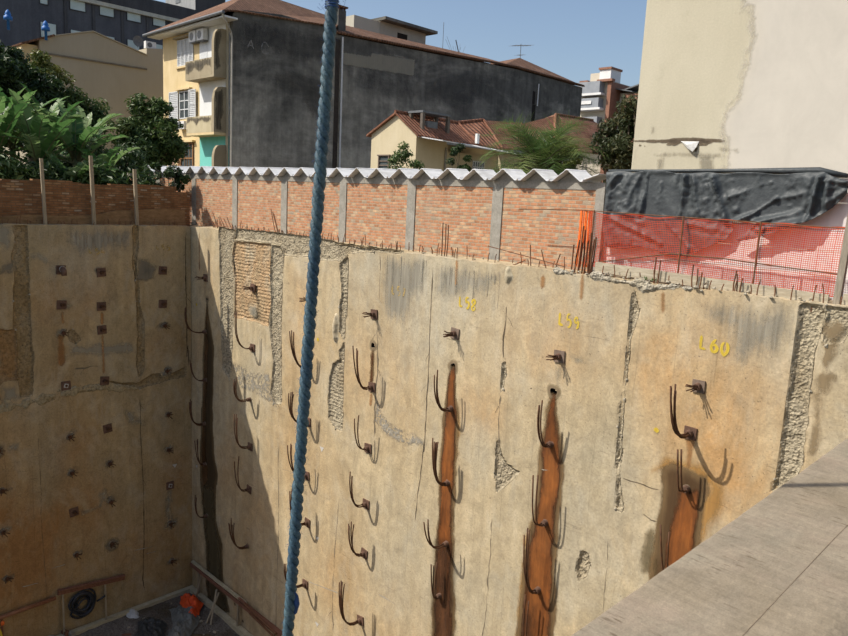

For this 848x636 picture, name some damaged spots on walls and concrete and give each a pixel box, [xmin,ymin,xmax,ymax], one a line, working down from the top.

spalling [0,217,78,397]
spalling [93,219,187,390]
spalling [201,210,310,405]
spalling [320,223,475,431]
spalling [488,226,712,512]
spalling [721,270,761,295]
spalling [772,284,848,492]
rust [431,367,460,636]
rust [516,394,564,636]
spalling [576,549,591,580]
rust [641,440,721,580]